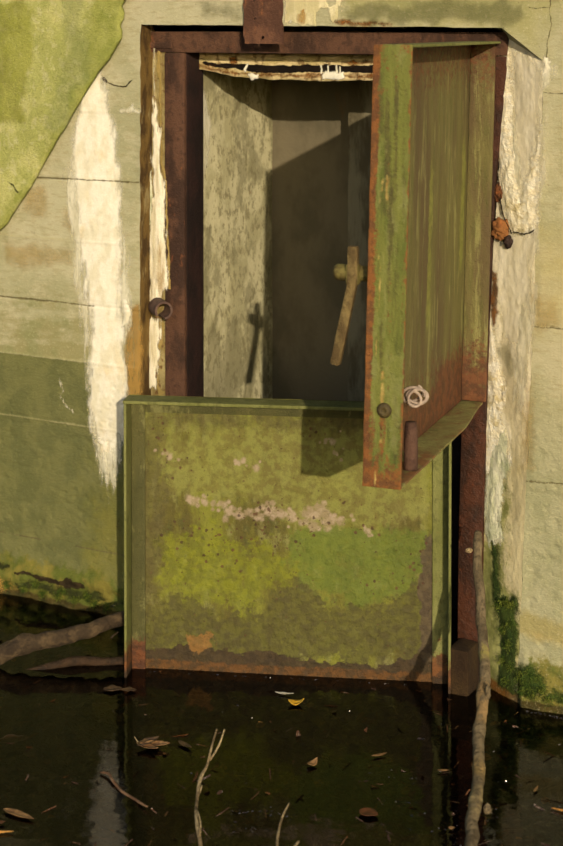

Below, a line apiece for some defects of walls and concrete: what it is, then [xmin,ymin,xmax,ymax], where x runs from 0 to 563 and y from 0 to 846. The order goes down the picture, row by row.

peeling [284,0,343,27]
crack [529,0,552,58]
leakage [67,71,132,488]
corrosion [156,51,171,289]
leakage [484,50,551,544]